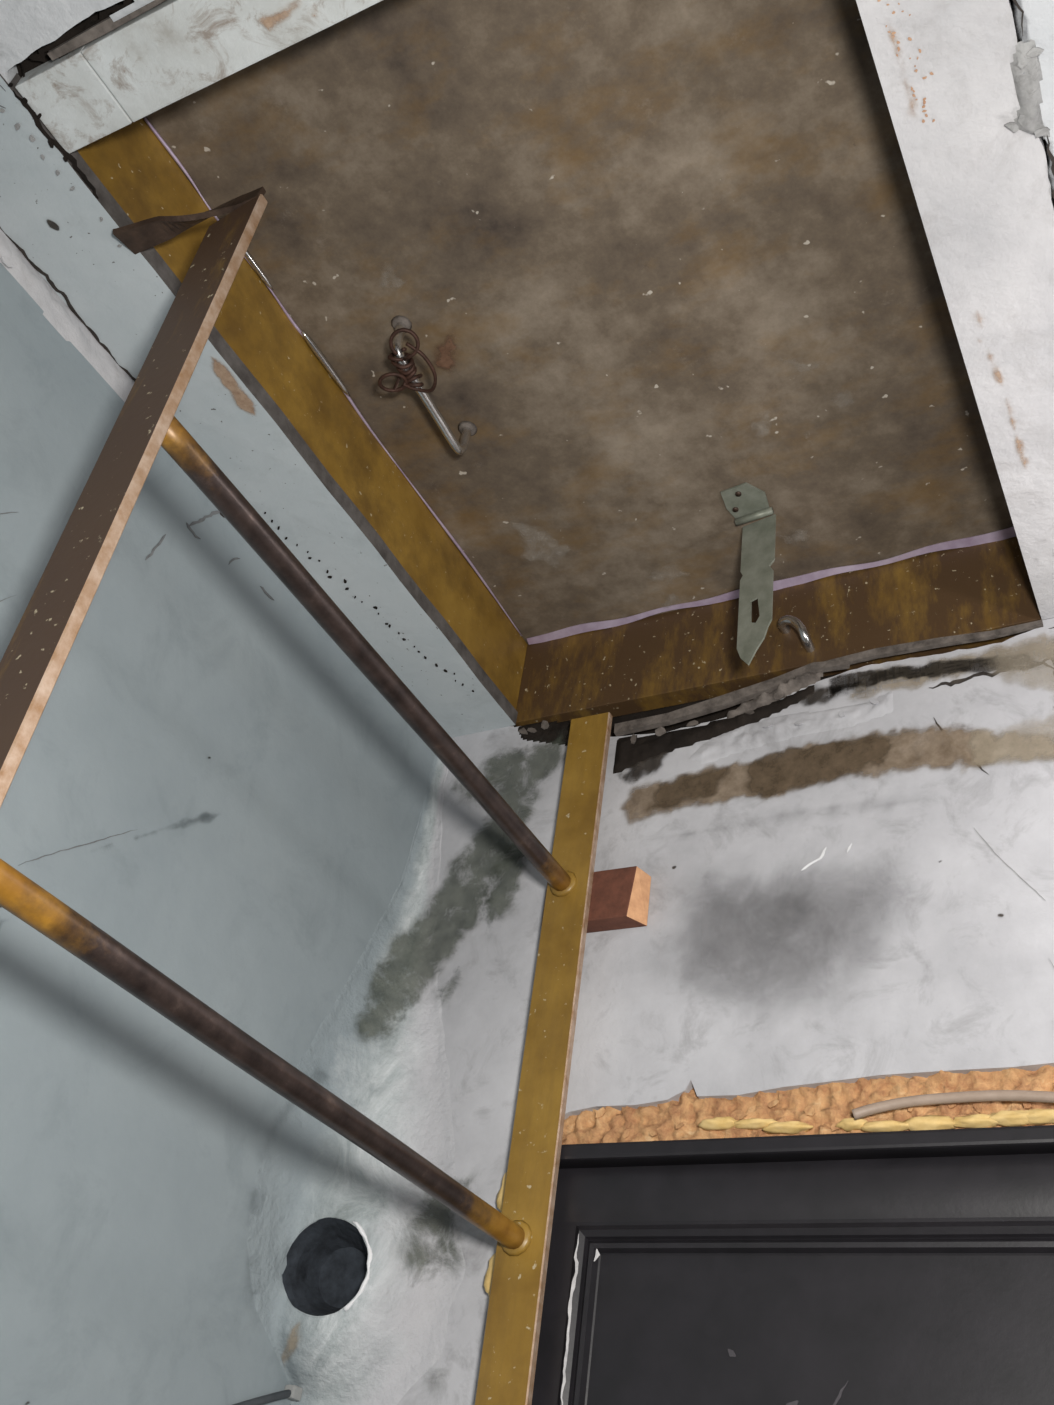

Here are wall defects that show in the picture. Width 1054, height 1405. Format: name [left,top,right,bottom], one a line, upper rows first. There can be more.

flaking render [110,0,154,22]
corrosion [260,8,292,30]
crack [1013,0,1028,74]
crack [1027,132,1054,198]
flaking render [689,672,893,764]
damp [799,637,1054,705]
crack [929,627,1054,729]
damp [486,738,561,822]
damp [622,726,1054,822]
damp [359,821,524,1037]